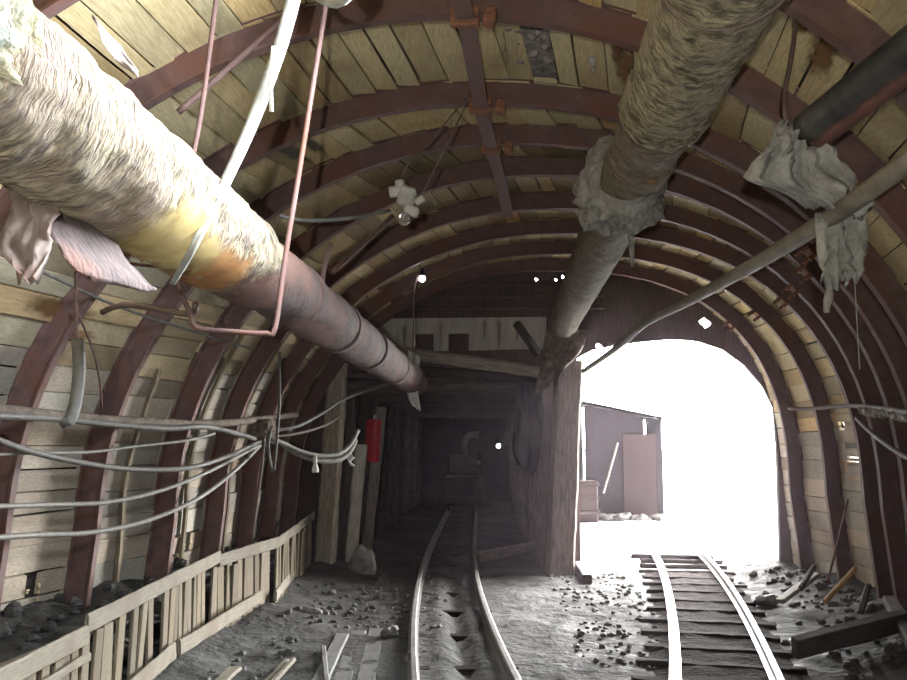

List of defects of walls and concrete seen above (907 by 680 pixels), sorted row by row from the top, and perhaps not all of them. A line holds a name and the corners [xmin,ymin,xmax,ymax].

spalling [505,25,558,78]
corrosion [810,73,907,147]